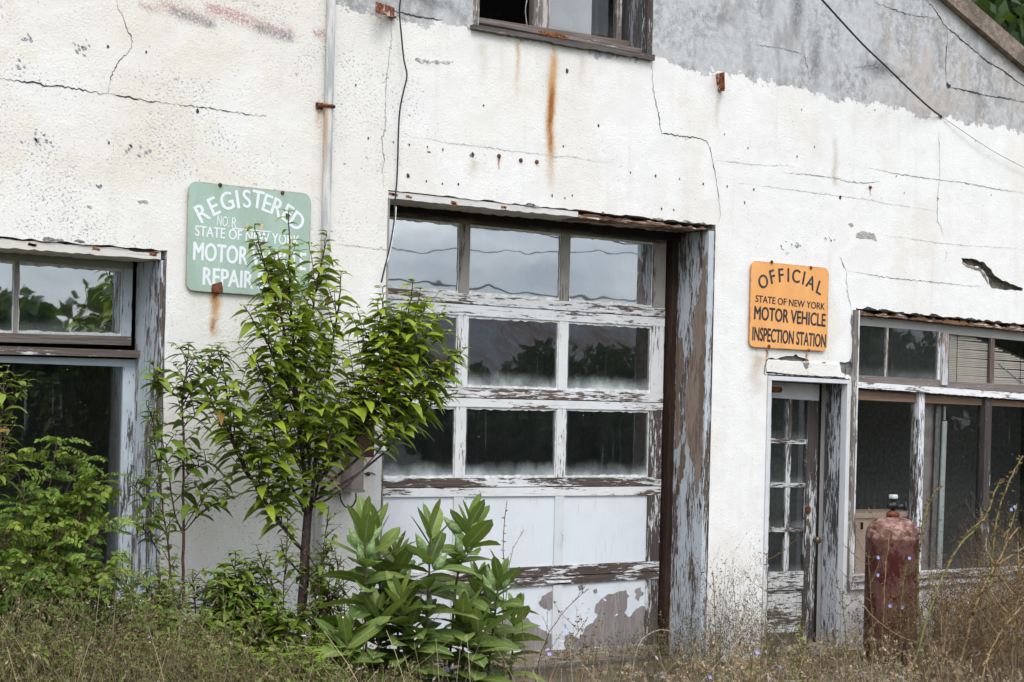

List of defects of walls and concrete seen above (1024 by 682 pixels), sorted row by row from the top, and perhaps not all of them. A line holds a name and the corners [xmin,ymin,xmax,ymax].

crack [0,0,265,116]
corrosion [547,54,557,162]
crack [651,66,1016,309]
spalling [962,258,1023,291]
corrosion [211,292,220,328]
peeling [674,251,708,499]
peeling [487,618,551,652]
peeling [539,591,552,611]
peeling [564,585,645,649]